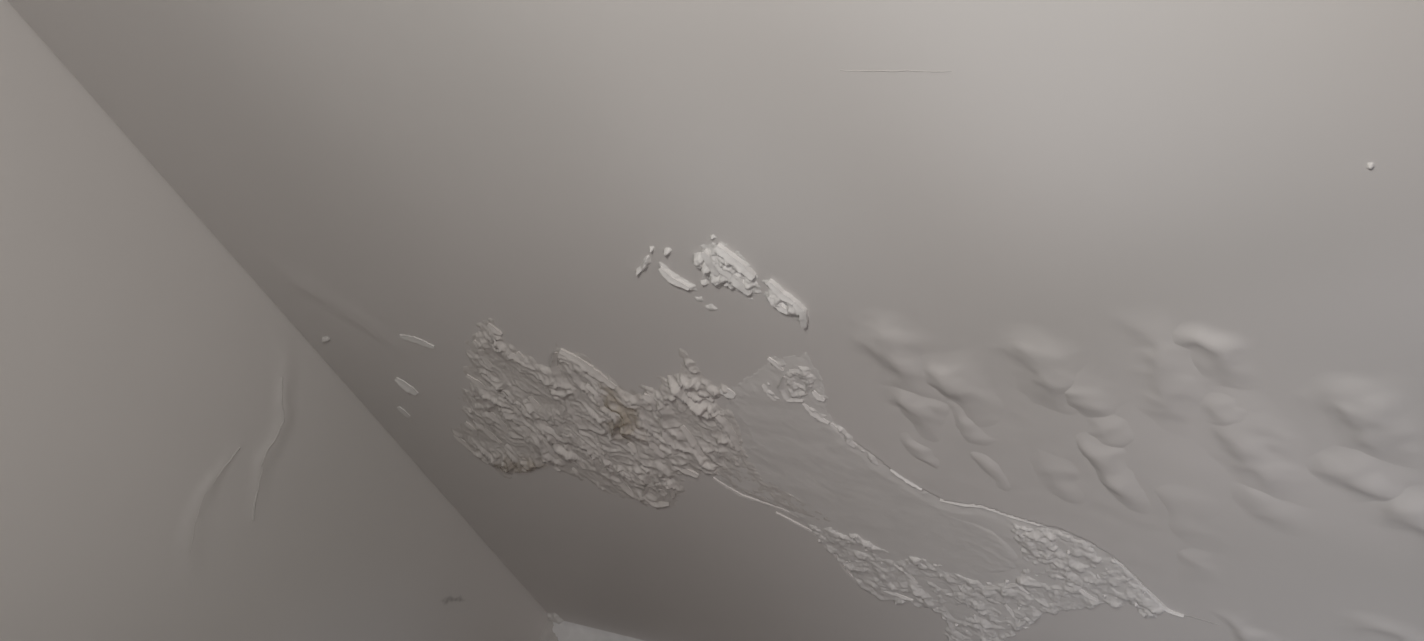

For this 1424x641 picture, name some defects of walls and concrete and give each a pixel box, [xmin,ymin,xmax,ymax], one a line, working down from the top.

peeling [636,234,809,329]
flaking render [451,318,1164,641]